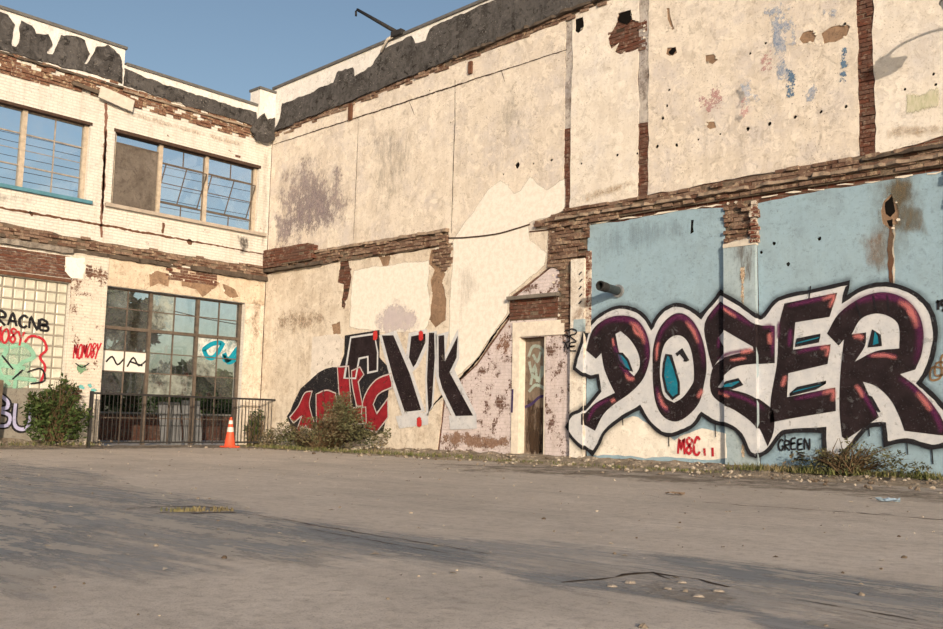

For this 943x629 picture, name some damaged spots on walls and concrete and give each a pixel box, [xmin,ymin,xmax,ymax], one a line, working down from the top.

spalling [608,10,647,54]
peeling [749,2,851,102]
leakage [276,159,347,241]
peeling [149,271,238,299]
crack [148,506,494,555]
crack [564,572,730,587]